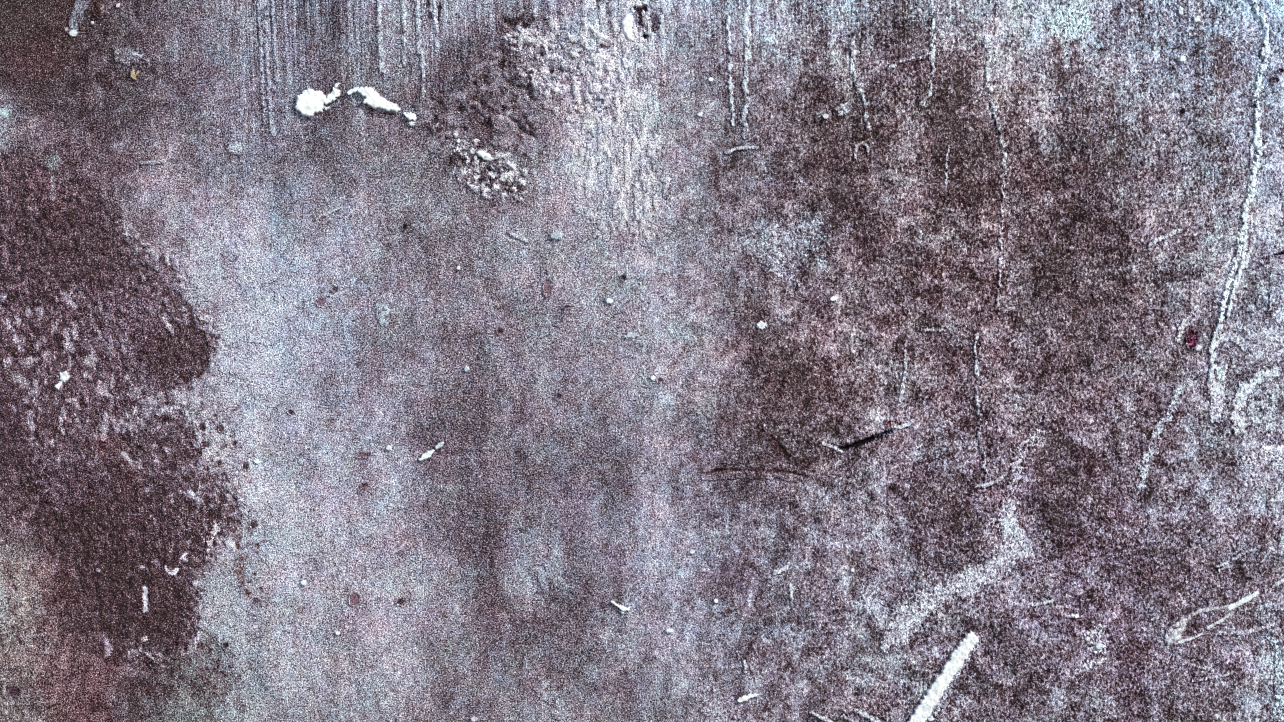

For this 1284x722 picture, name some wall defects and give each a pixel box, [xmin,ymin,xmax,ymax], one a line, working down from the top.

damp [937,46,975,134]
damp [1043,0,1096,98]
damp [1205,31,1234,125]
damp [42,149,64,202]
damp [728,173,847,289]
damp [1131,385,1183,498]
damp [1205,364,1284,467]
damp [881,426,1052,654]
damp [0,514,70,722]
damp [189,567,268,673]
damp [1073,621,1113,676]
damp [1264,630,1284,722]